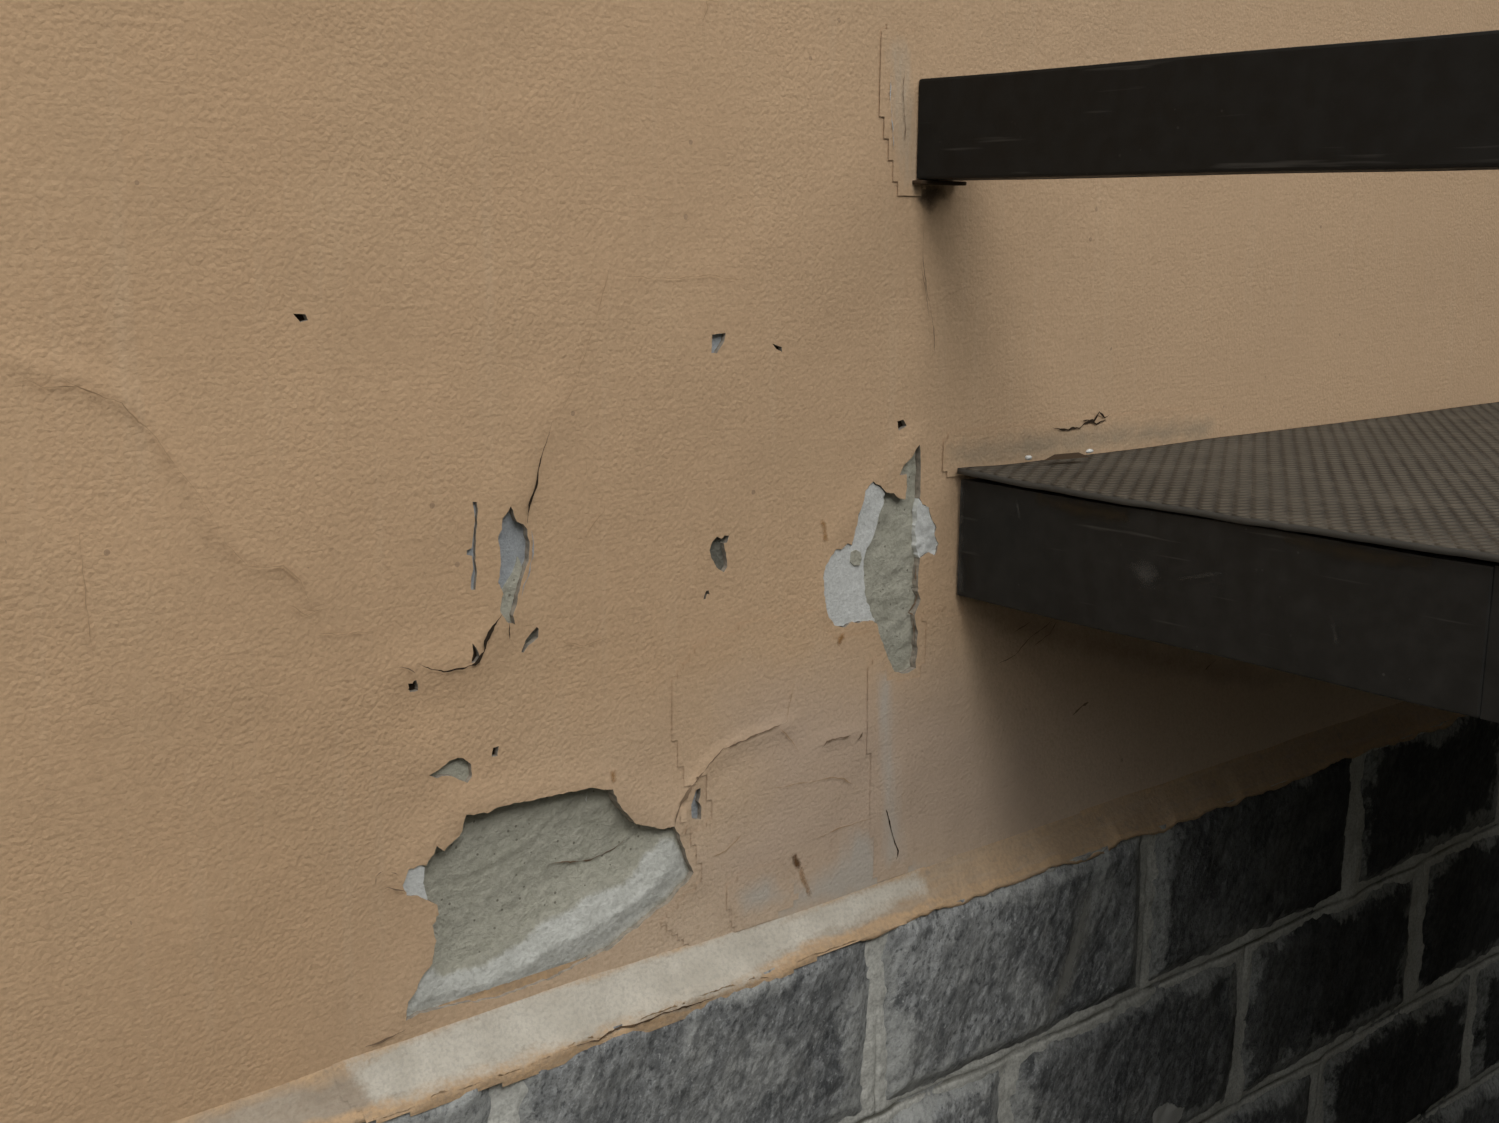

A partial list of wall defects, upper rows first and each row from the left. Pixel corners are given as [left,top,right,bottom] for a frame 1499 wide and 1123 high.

crack [527,261,613,522]
flaking render [467,502,476,589]
flaking render [498,511,534,623]
peeling [710,536,725,570]
flaking render [823,453,938,672]
crack [399,615,510,673]
peeling [431,758,469,781]
crack [675,687,863,823]
crack [818,810,899,857]
peeling [333,788,941,1123]